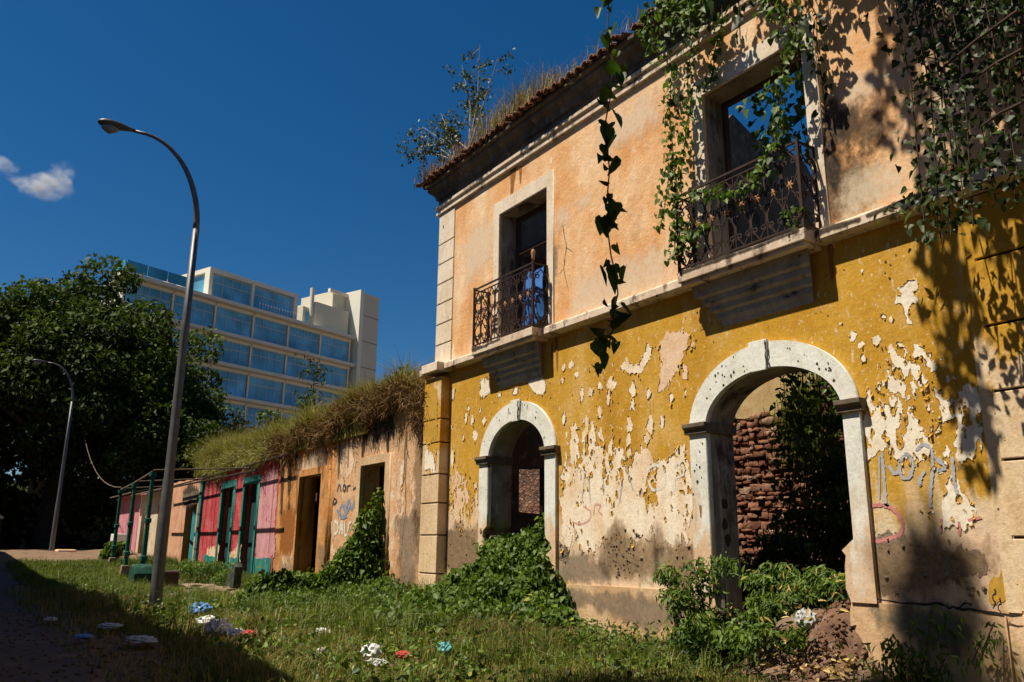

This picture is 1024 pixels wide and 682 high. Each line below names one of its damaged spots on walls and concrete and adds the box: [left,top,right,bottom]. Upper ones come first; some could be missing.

water stain [280,453,299,514]
water stain [338,414,425,584]
peeling [445,311,703,578]
water stain [558,521,694,630]
peeling [839,322,1018,605]